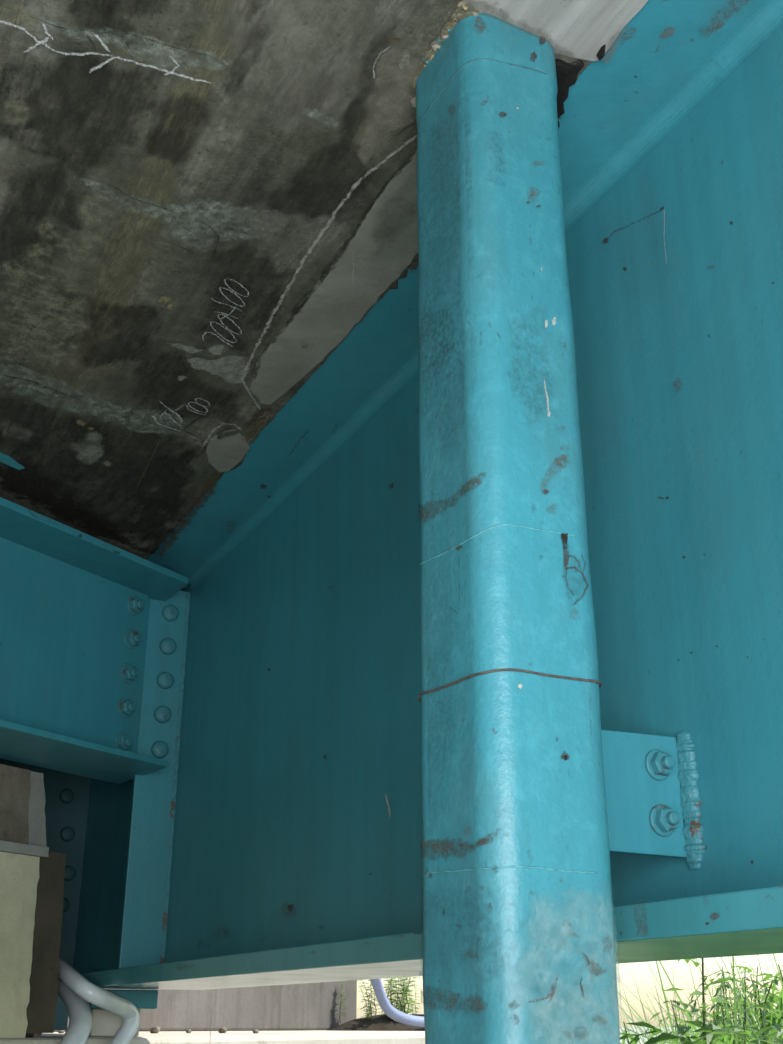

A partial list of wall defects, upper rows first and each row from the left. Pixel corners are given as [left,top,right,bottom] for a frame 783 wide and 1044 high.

damp [0,0,408,553]
crack [115,152,417,378]